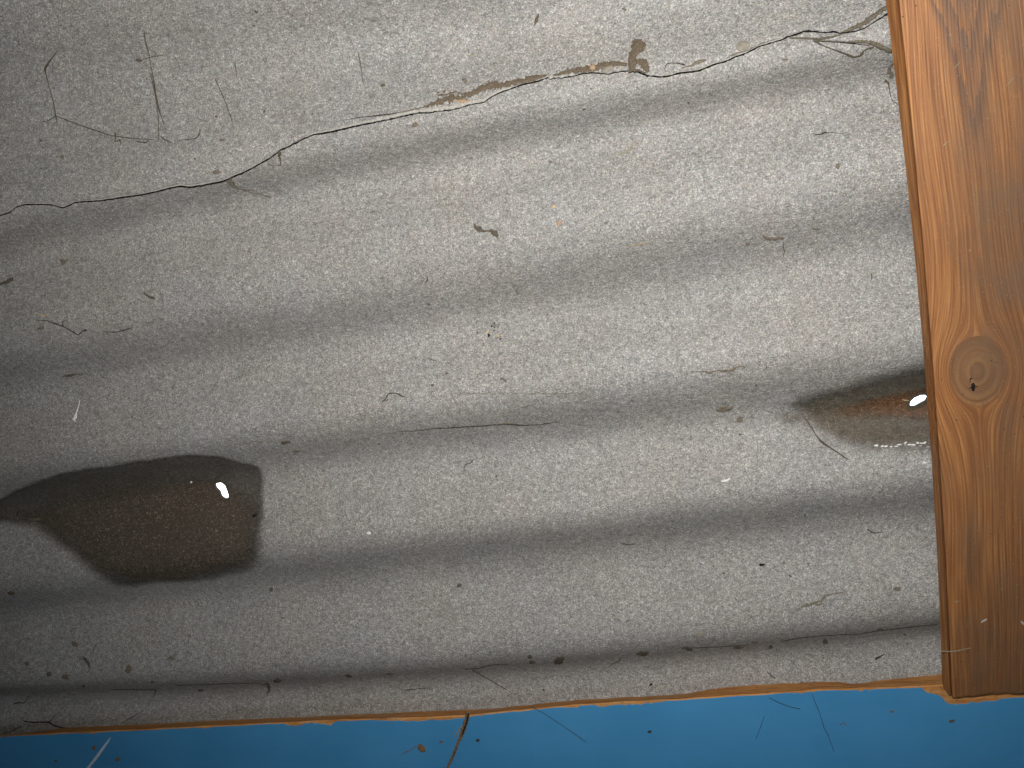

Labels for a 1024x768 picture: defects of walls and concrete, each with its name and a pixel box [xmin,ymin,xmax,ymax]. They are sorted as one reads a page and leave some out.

crack [0,14,888,216]
water stain [0,455,262,585]